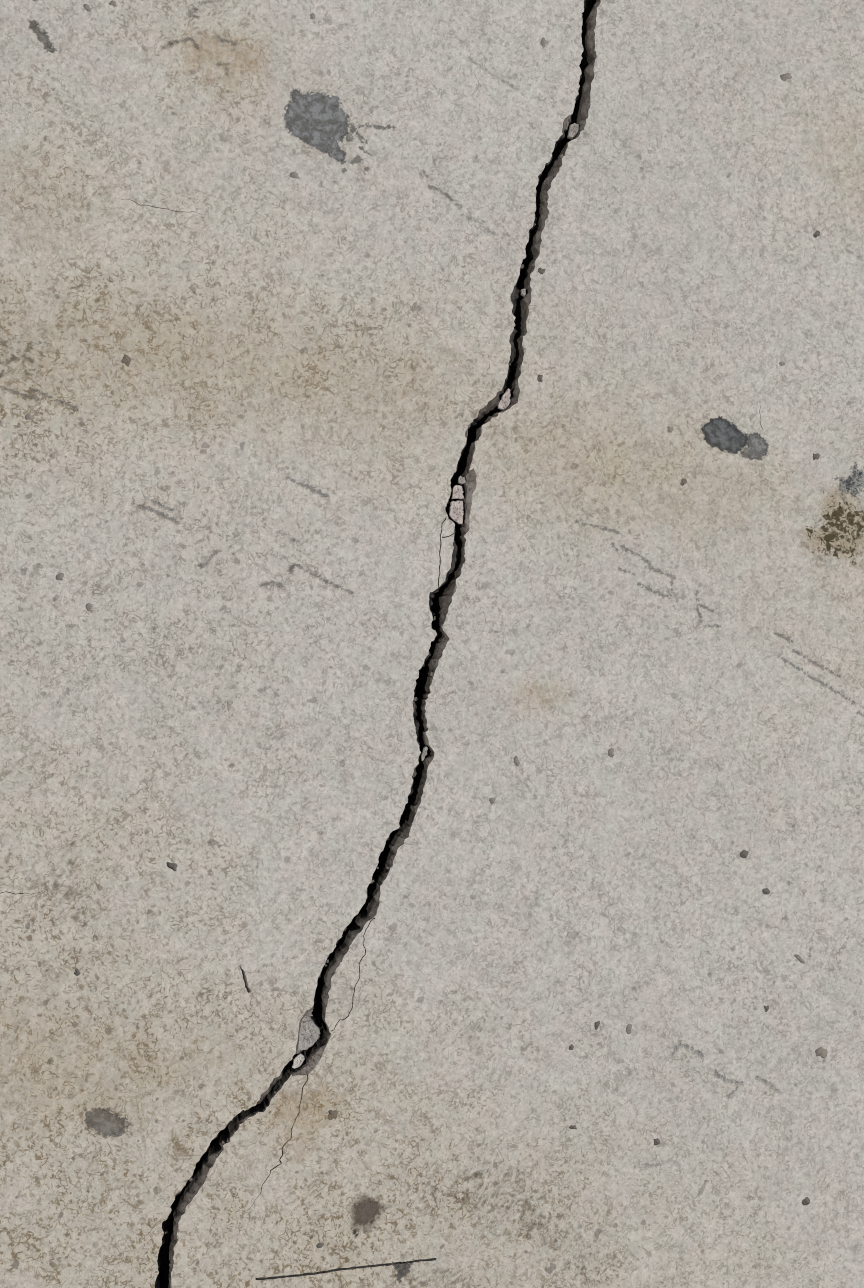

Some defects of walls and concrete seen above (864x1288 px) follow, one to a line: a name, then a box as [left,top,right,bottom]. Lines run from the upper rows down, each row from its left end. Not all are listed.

crack [155,0,601,1288]